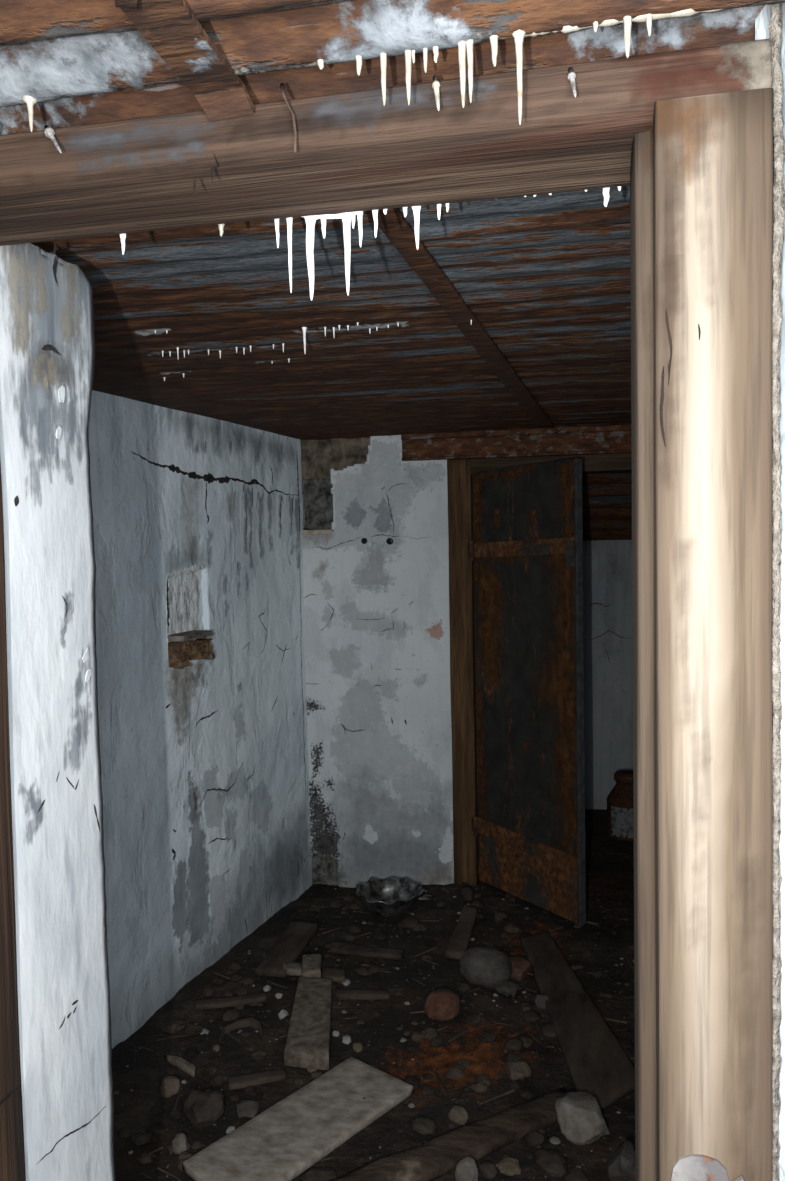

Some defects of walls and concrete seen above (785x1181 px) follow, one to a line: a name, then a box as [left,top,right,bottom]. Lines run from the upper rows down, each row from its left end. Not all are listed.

leakage [203,0,785,90]
leakage [0,28,168,135]
leakage [312,211,362,219]
leakage [135,328,171,336]
leakage [296,321,407,334]
spalling [300,437,370,479]
crack [131,451,431,878]
leakage [309,742,341,867]
crack [36,1106,106,1165]